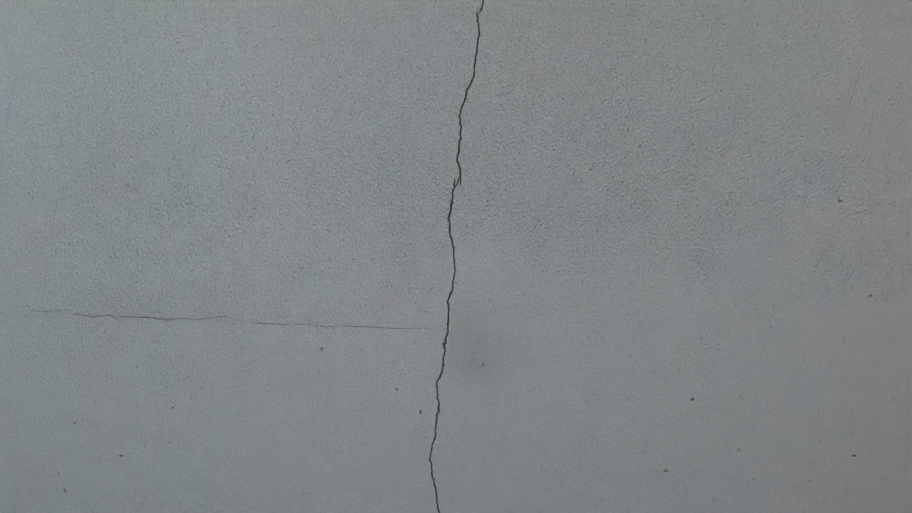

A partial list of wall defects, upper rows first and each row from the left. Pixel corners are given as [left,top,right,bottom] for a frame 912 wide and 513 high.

crack [17,0,484,513]